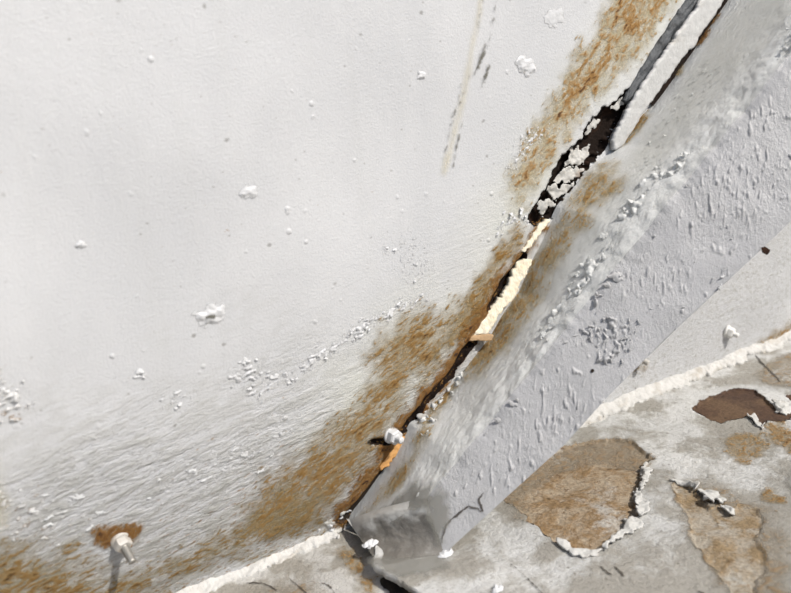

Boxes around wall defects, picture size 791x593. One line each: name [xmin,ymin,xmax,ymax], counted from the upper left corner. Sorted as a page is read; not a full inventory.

corrosion [504,0,678,205]
crack [650,0,728,106]
crack [528,89,627,226]
crack [487,252,528,312]
corrosion [0,162,625,593]
crack [368,341,478,446]
peeling [692,388,791,429]
crack [337,468,384,524]
crack [441,494,483,543]
peeling [504,438,655,558]
peeling [669,479,769,593]